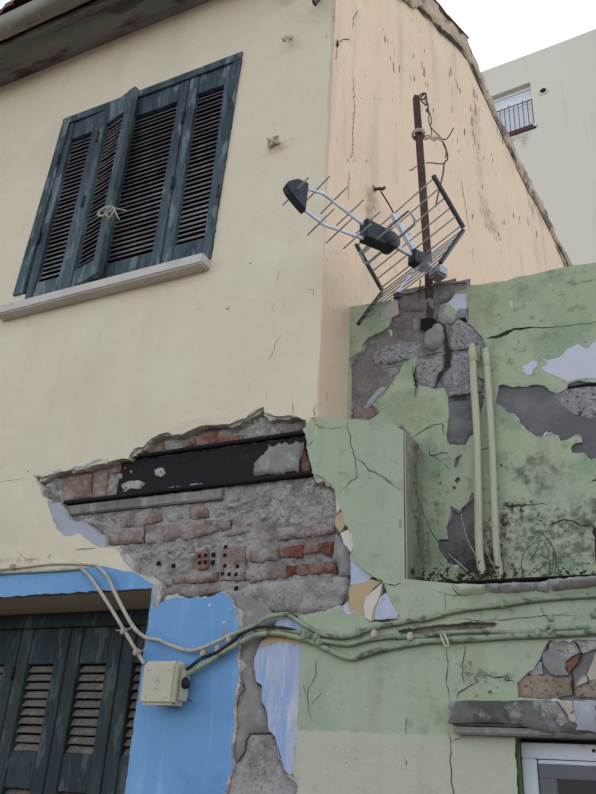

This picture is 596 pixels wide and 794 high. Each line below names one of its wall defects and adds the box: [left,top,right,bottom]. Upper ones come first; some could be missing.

flaking render [350,278,491,445]
crack [386,321,596,399]
spalling [496,341,596,460]
crack [415,423,447,466]
crack [292,404,422,567]
spalling [438,493,484,573]
crack [502,503,596,562]
spalling [27,407,398,794]
crack [468,606,576,621]
crack [446,651,515,698]
spalling [517,638,596,701]
crack [447,730,464,794]